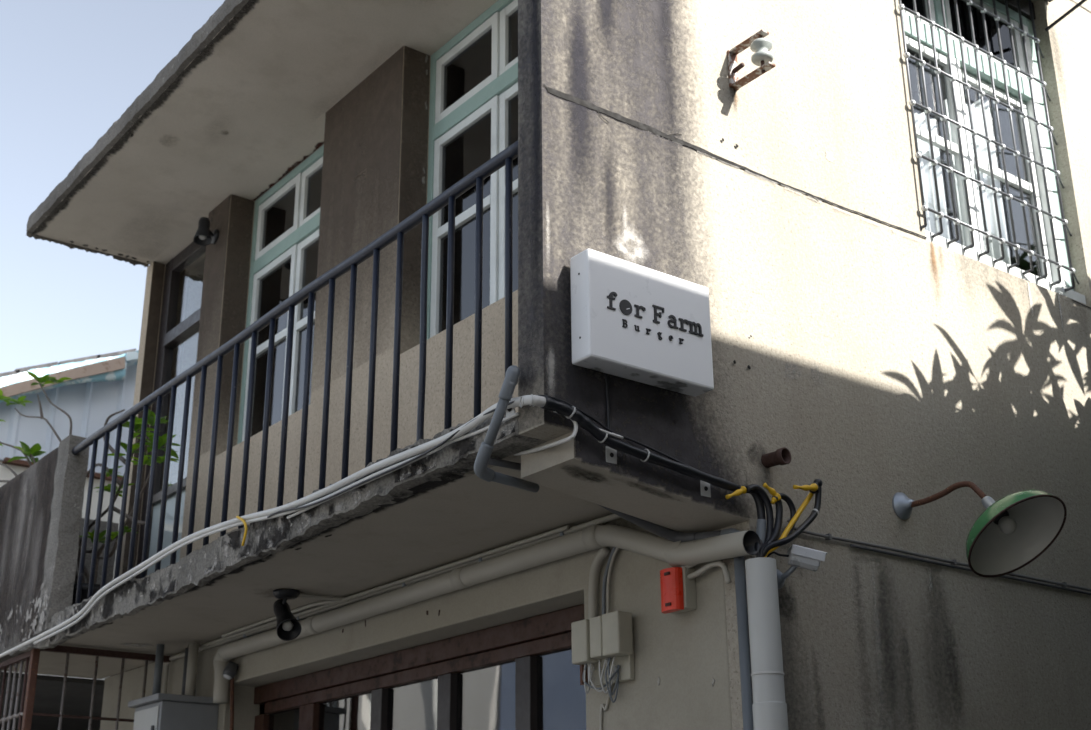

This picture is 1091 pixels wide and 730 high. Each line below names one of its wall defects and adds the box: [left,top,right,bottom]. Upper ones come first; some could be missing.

crack [544,84,927,239]
water stain [518,0,746,513]
water stain [0,447,58,647]
peeling [0,583,78,649]
water stain [47,261,176,643]
water stain [222,495,334,558]
spalling [114,444,464,610]
water stain [392,446,433,483]
water stain [450,426,475,460]